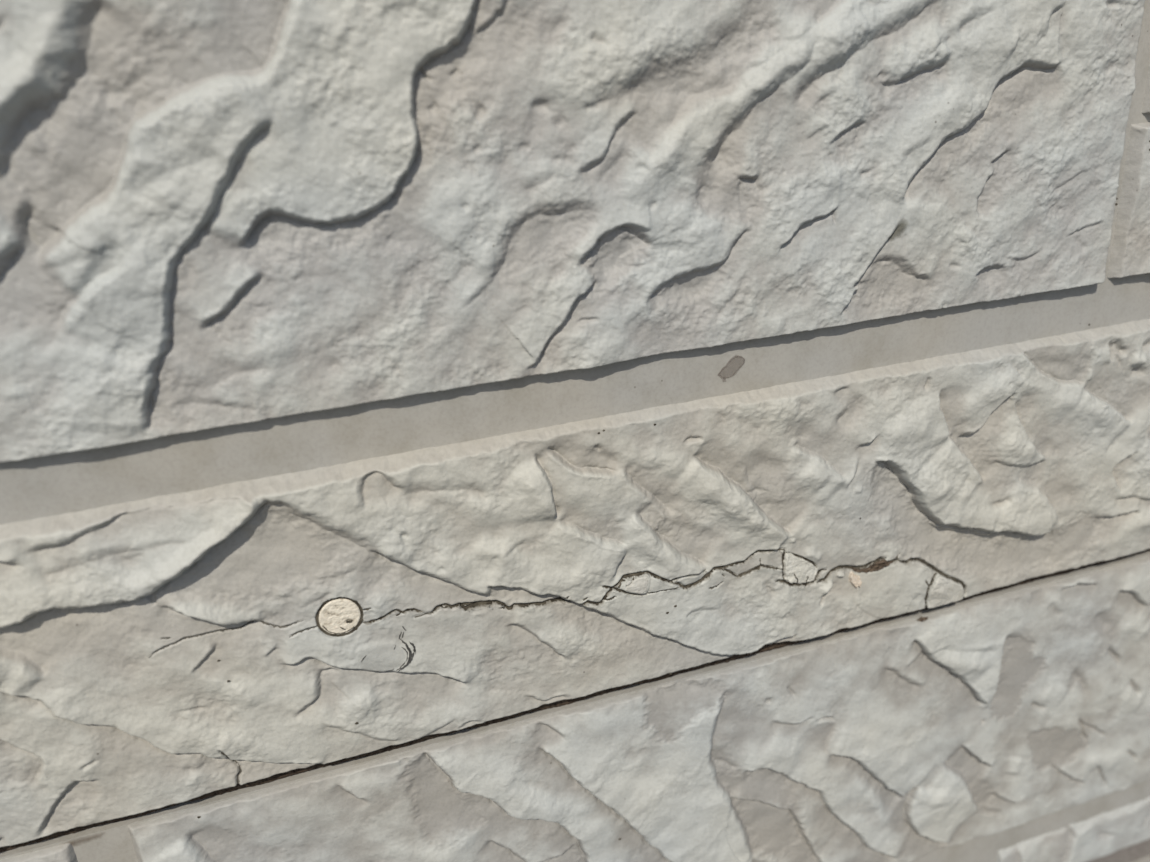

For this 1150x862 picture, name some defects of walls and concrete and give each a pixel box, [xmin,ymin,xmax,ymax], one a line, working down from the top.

crack [364,549,965,624]
crack [148,620,315,658]